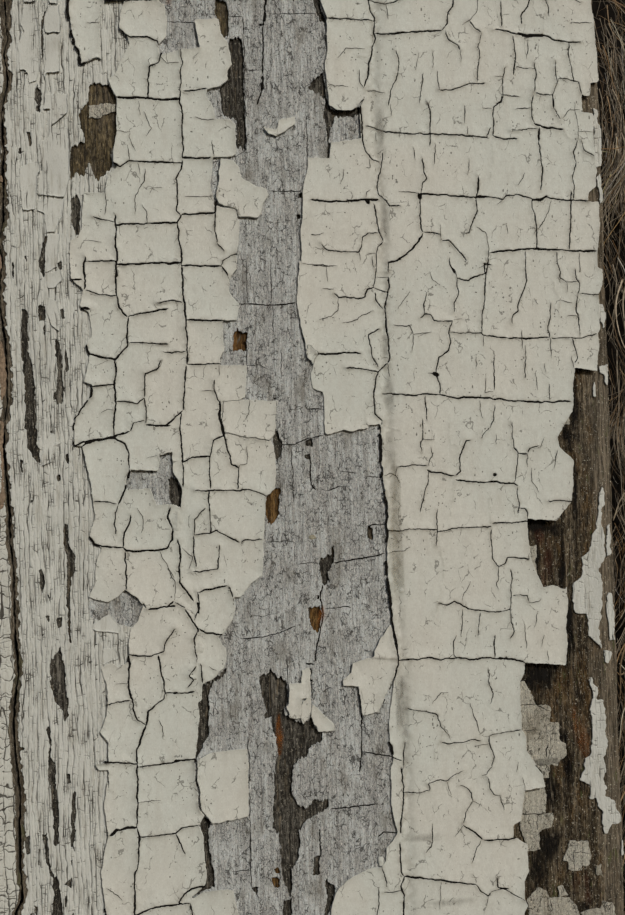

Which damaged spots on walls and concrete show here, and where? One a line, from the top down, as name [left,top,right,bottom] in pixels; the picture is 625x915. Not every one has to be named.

peeling [17,0,61,83]
peeling [19,161,64,232]
peeling [38,234,63,288]
peeling [38,0,239,266]
crack [0,0,323,915]
peeling [69,162,276,767]
peeling [140,0,624,915]
crack [230,0,599,704]
peeling [95,760,207,915]
crack [331,802,376,810]
crack [358,688,534,915]